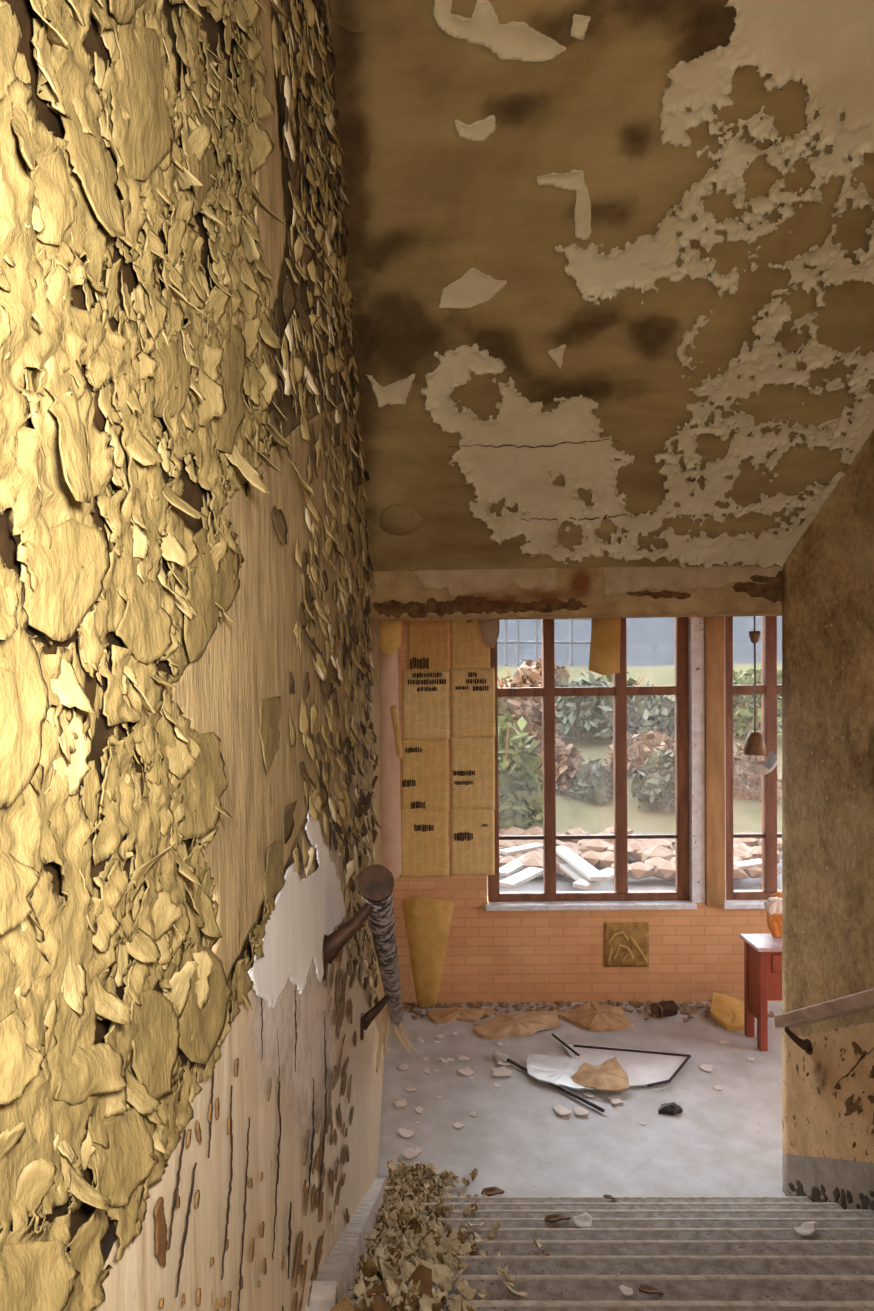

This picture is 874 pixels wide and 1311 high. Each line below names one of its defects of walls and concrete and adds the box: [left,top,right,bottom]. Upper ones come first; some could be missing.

water stain [686,0,734,60]
water stain [338,124,439,462]
water stain [484,334,519,366]
water stain [564,384,607,397]
peeling [420,0,874,603]
peeling [0,0,591,1311]
flaking render [835,1041,874,1146]